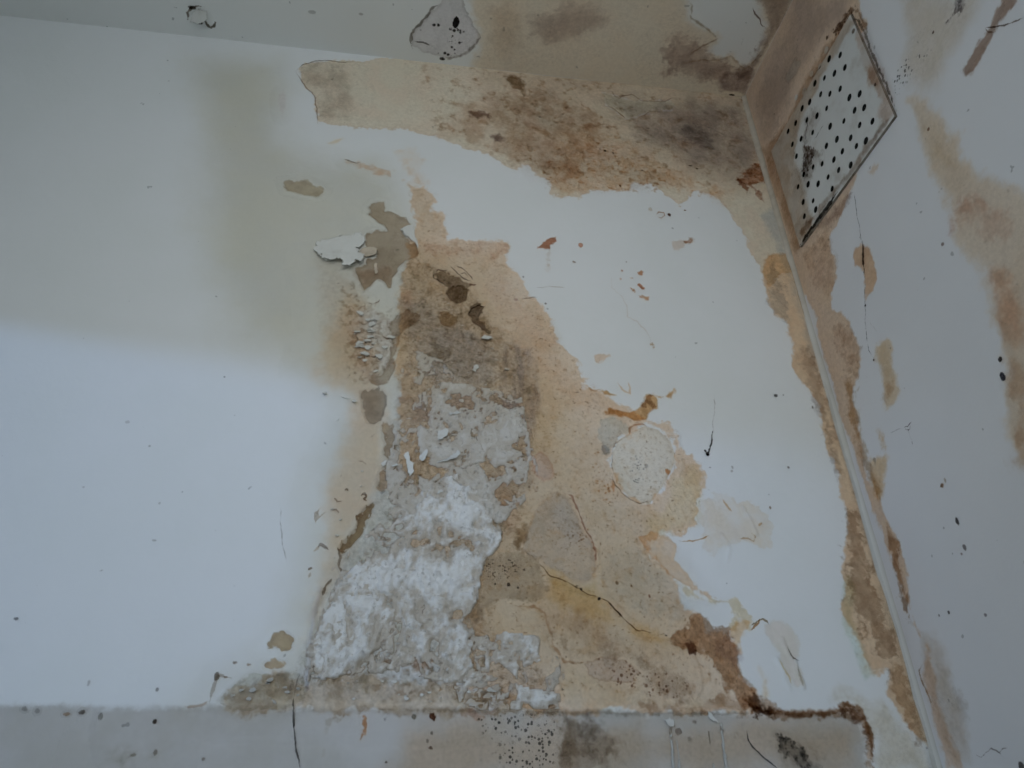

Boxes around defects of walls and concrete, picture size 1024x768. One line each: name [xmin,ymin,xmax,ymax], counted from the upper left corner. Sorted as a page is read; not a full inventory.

peeling [314,232,378,274]
peeling [354,311,395,373]
peeling [382,449,461,476]
damp [305,350,565,767]
crack [546,571,667,636]
crack [292,699,300,761]
damp [748,693,773,719]
damp [778,734,810,768]